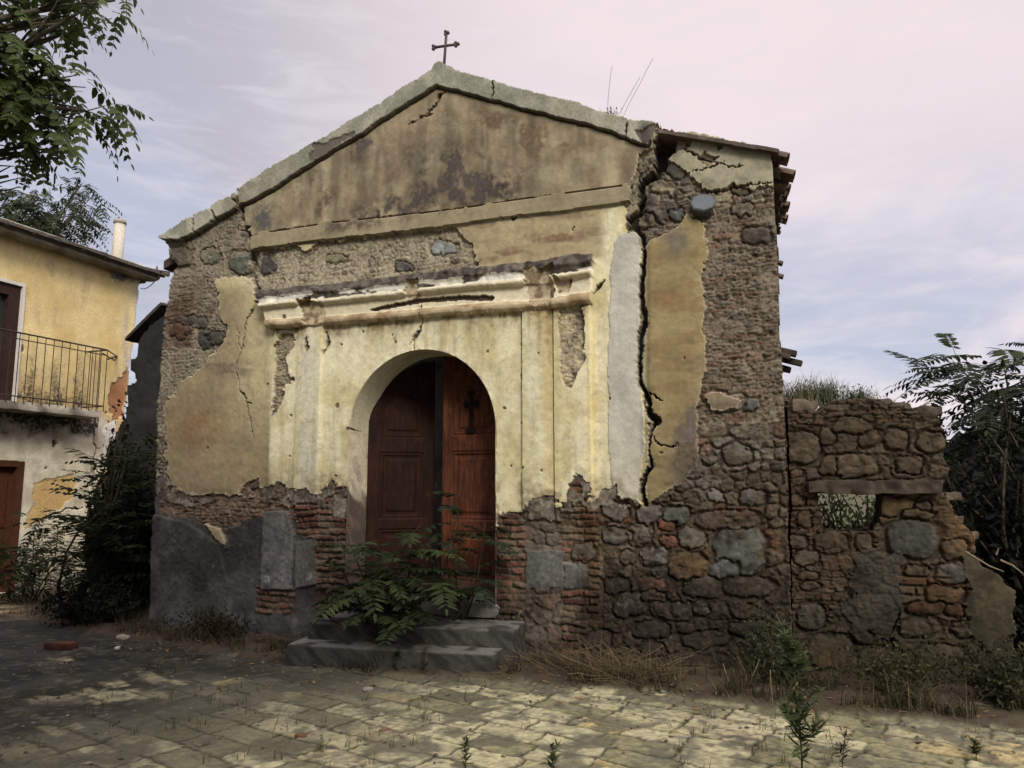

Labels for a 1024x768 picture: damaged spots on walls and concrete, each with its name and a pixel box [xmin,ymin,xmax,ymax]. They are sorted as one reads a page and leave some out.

damp [327,150,513,230]
crack [409,90,447,125]
spalling [104,366,129,420]
crack [236,190,261,429]
spalling [156,206,480,426]
crack [627,129,772,506]
peeling [25,466,78,527]
spalling [147,458,350,638]
crack [785,407,793,638]